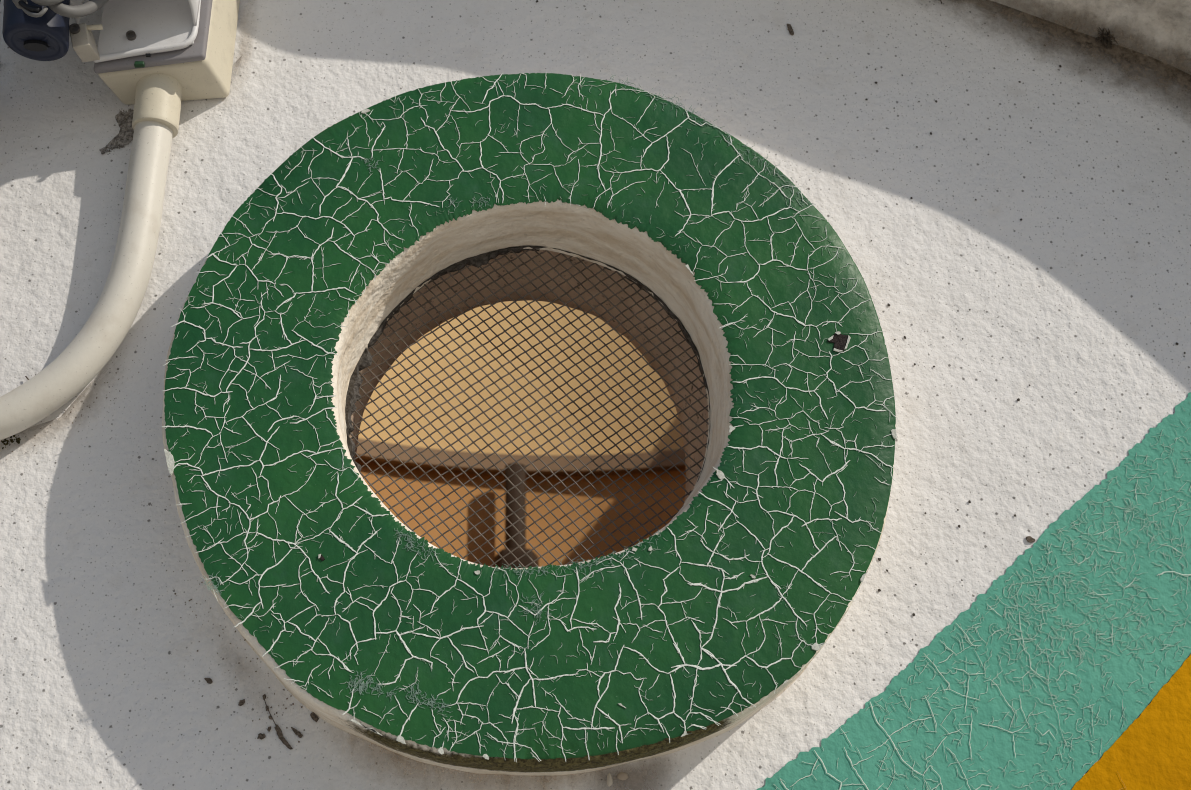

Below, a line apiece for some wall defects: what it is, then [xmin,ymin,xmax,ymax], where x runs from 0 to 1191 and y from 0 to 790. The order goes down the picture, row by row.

damp [952,0,1191,106]
crack [162,73,898,762]